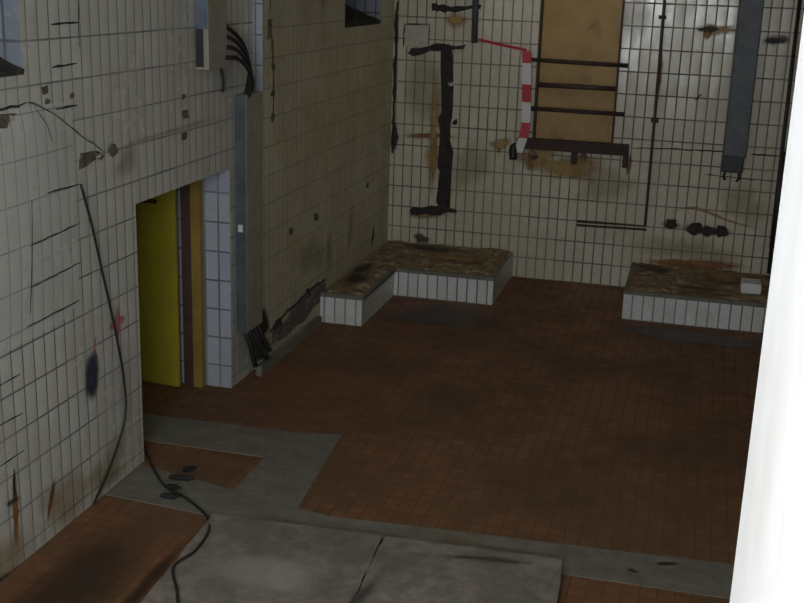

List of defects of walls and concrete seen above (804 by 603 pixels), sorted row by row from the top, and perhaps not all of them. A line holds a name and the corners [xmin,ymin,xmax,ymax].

crack [51,0,80,68]
crack [0,102,105,153]
rust [409,99,440,176]
rust [521,150,594,177]
spalling [270,279,326,345]
rust [7,472,19,544]